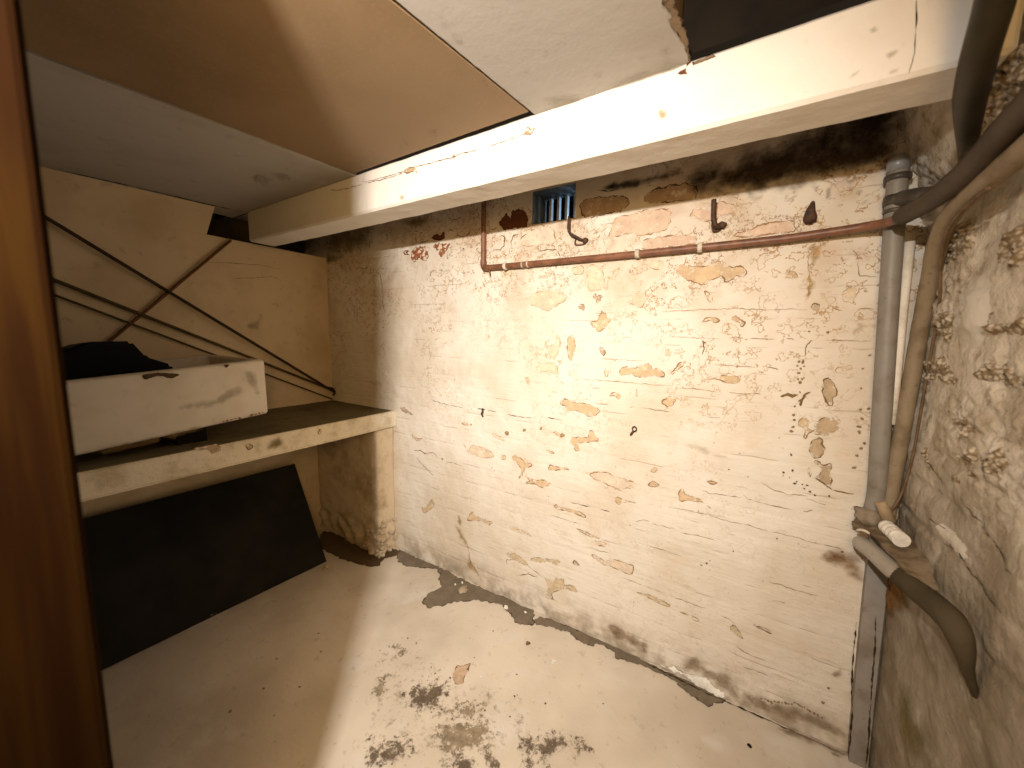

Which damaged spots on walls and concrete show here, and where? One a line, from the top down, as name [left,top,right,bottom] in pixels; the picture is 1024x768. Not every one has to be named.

crack [909,0,918,72]
spalling [403,232,450,262]
flaking render [499,182,747,302]
flaking render [733,220,796,238]
peeling [571,264,611,332]
peeling [599,347,684,397]
peeling [782,365,852,497]
peeling [464,445,569,488]
water stain [610,626,644,647]
water stain [686,659,735,694]
water stain [437,718,500,768]
water stain [756,698,841,756]